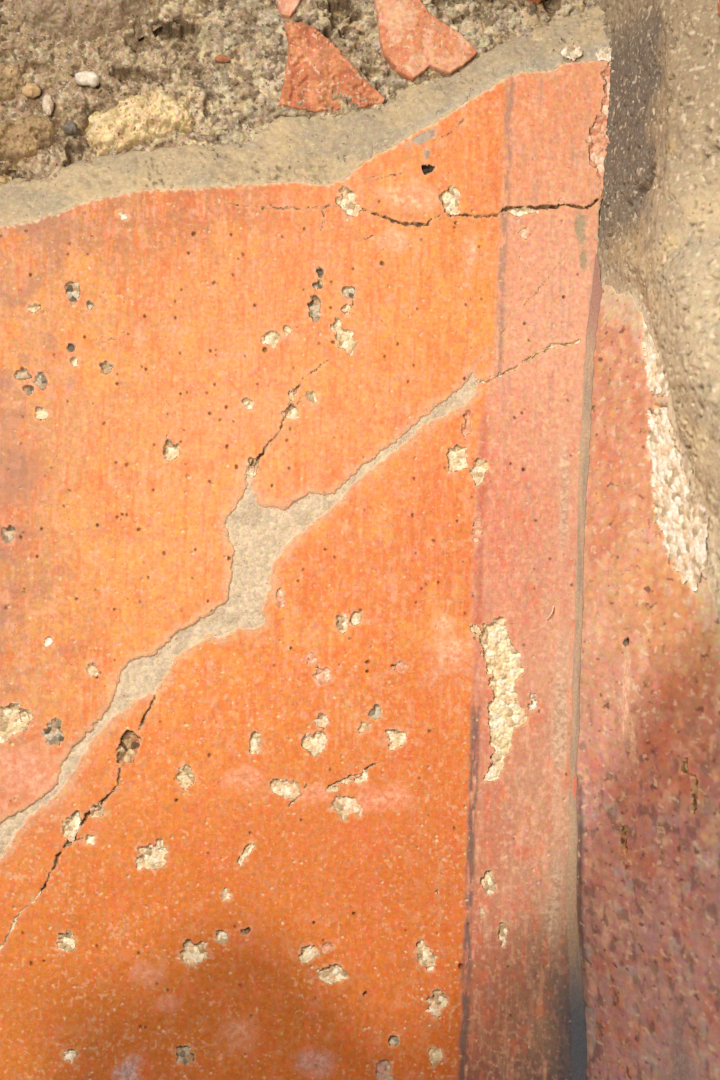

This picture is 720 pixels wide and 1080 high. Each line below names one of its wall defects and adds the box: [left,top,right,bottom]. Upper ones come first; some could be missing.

spalling [560,44,612,199]
crack [227,198,599,244]
spalling [308,268,359,356]
crack [249,360,329,467]
spalling [641,318,709,591]
crack [137,694,156,733]
spalling [471,617,538,781]
crack [288,763,379,808]
crack [0,767,121,950]
spalling [135,839,169,871]
crack [237,840,256,866]
spalling [299,942,348,984]